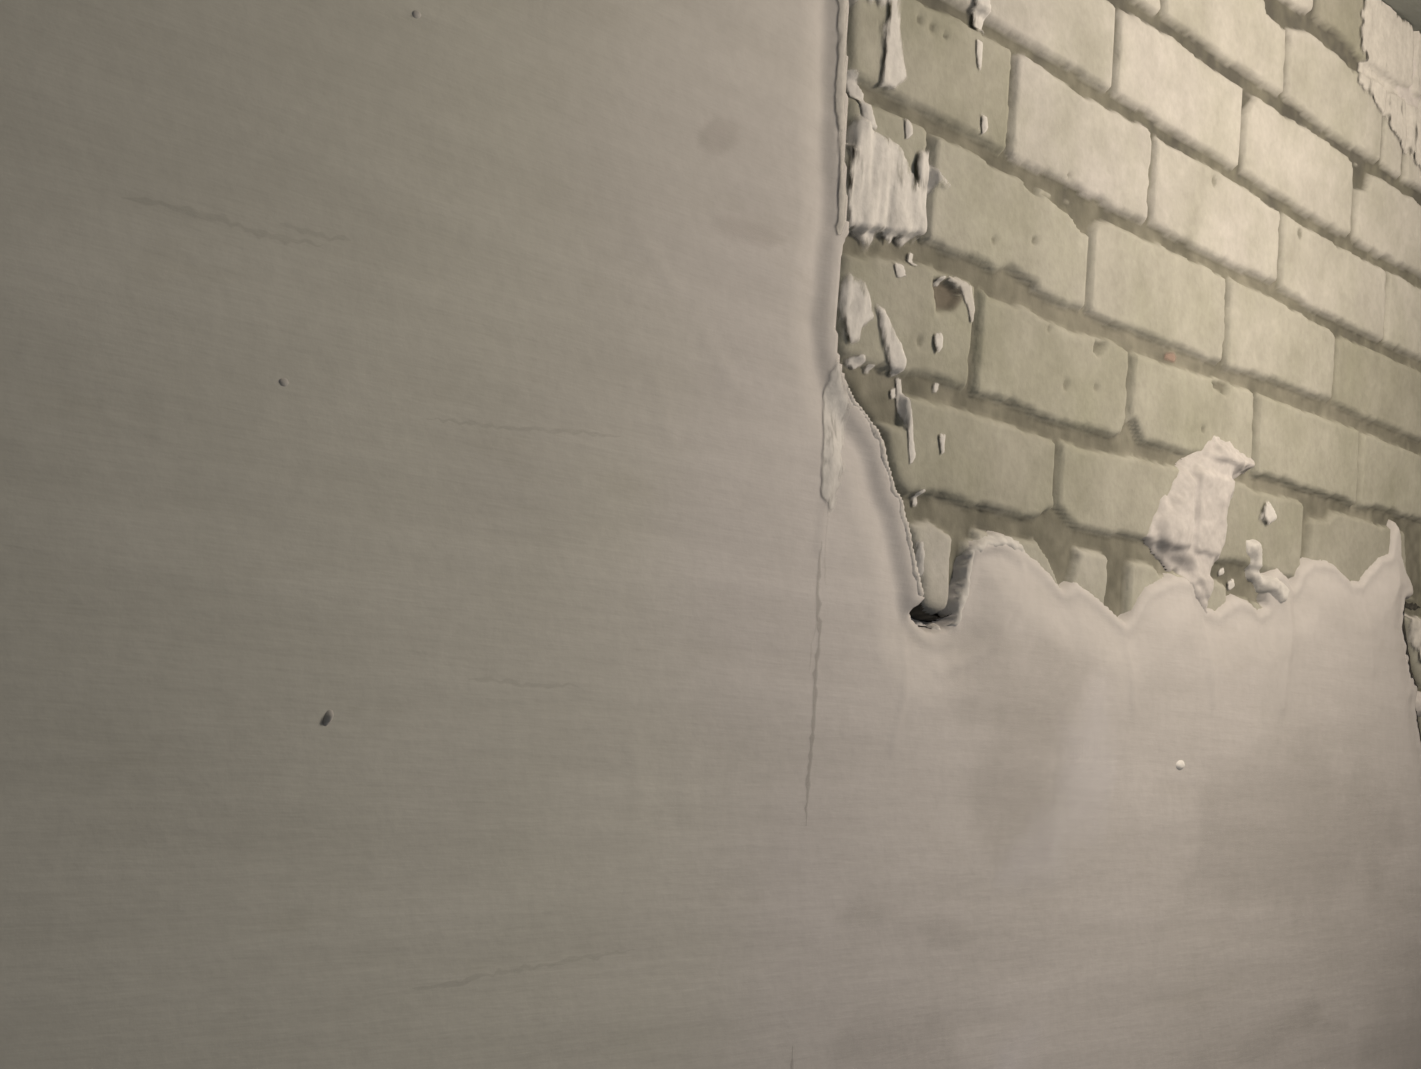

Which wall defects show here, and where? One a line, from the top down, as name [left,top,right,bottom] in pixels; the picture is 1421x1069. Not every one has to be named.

spalling [836,0,1421,734]